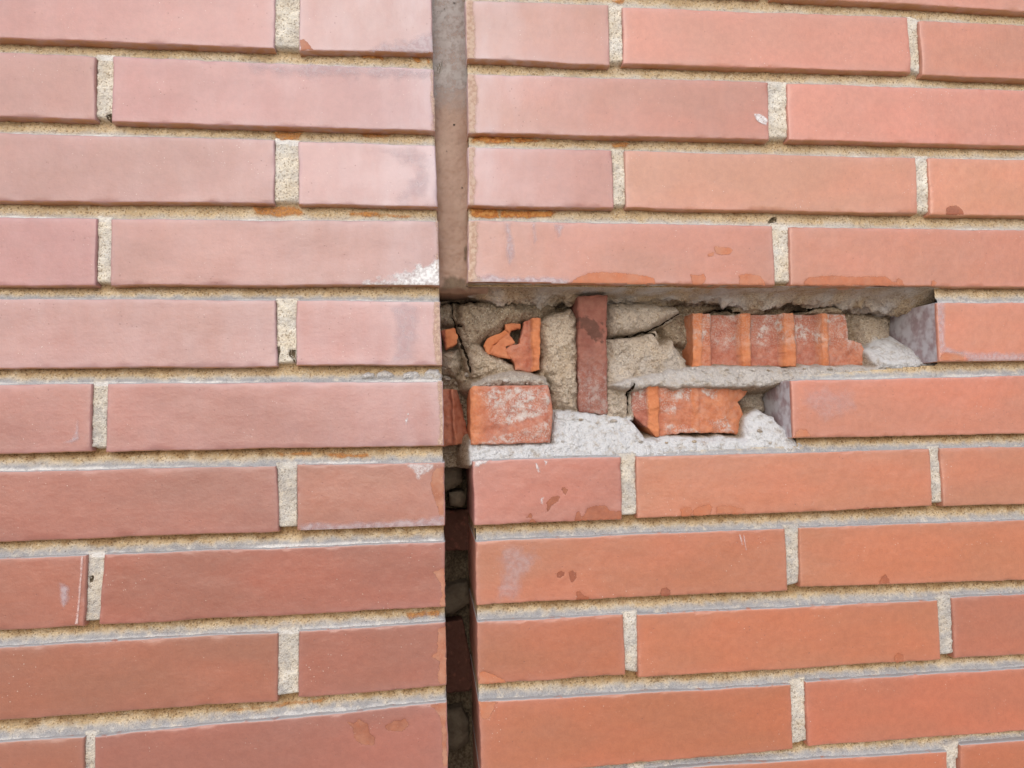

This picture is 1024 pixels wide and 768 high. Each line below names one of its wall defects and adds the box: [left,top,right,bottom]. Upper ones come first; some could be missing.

leakage [365,254,439,285]
spalling [361,272,964,523]